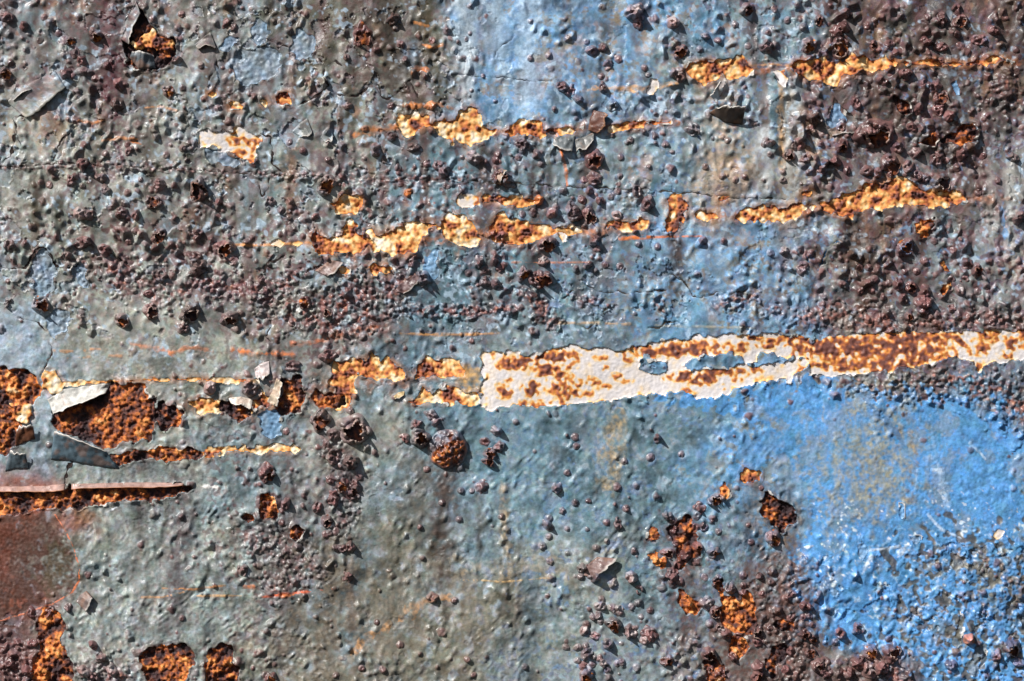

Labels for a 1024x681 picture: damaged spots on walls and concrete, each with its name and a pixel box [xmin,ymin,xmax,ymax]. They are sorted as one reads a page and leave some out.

spalling [118,1,179,75]
corrosion [0,135,519,196]
corrosion [550,210,703,244]
corrosion [785,201,822,225]
corrosion [157,368,336,426]
corrosion [354,365,417,410]
corrosion [454,358,483,394]
peeling [0,327,1024,471]
spalling [0,481,193,516]
corrosion [641,357,1024,681]
corrosion [0,505,102,681]
corrosion [70,647,142,681]